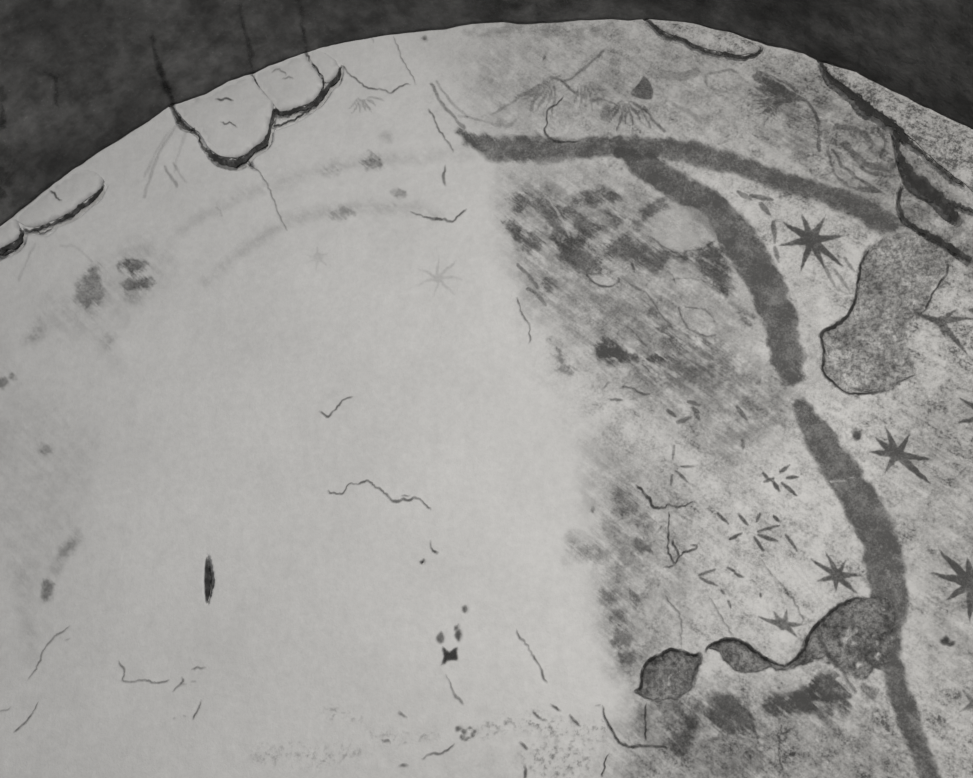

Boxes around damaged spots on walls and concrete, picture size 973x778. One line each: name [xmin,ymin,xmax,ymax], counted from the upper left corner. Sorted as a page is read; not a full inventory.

flaking render [653,22,763,56]
flaking render [176,51,340,160]
flaking render [826,66,973,192]
flaking render [0,170,105,249]
flaking render [819,234,957,397]
crack [329,480,430,508]
flaking render [634,595,897,700]